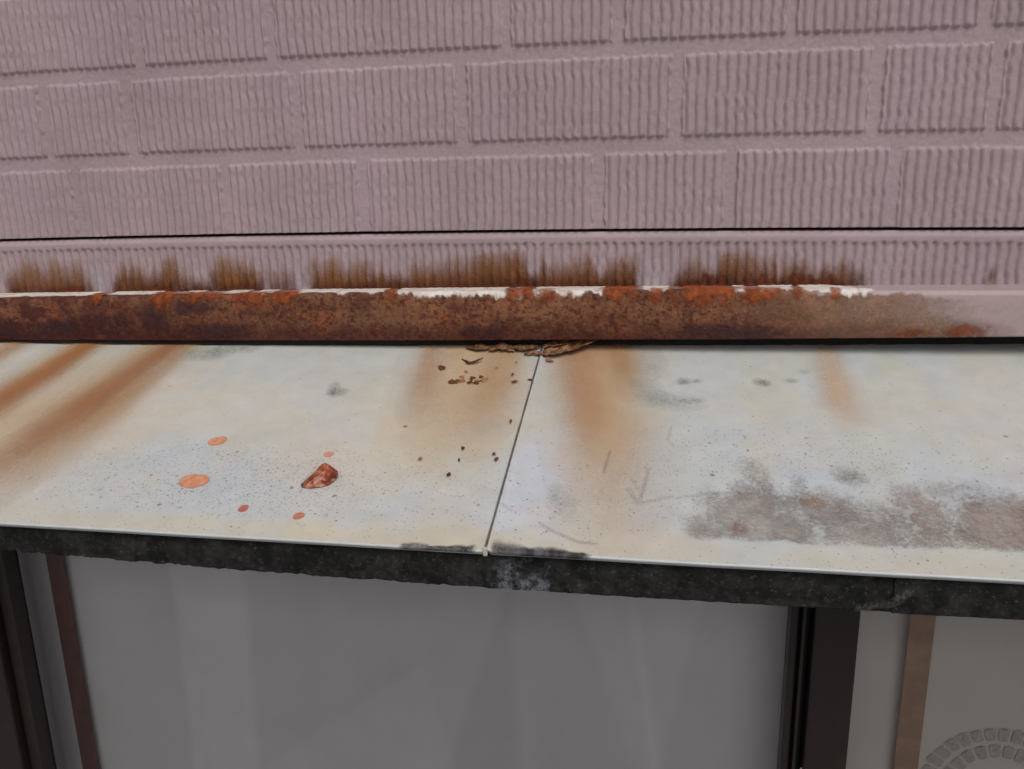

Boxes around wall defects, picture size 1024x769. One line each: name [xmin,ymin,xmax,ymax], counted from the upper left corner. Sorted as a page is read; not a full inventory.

corrosion [0,258,981,472]
corrosion [179,474,209,488]
corrosion [301,452,338,488]